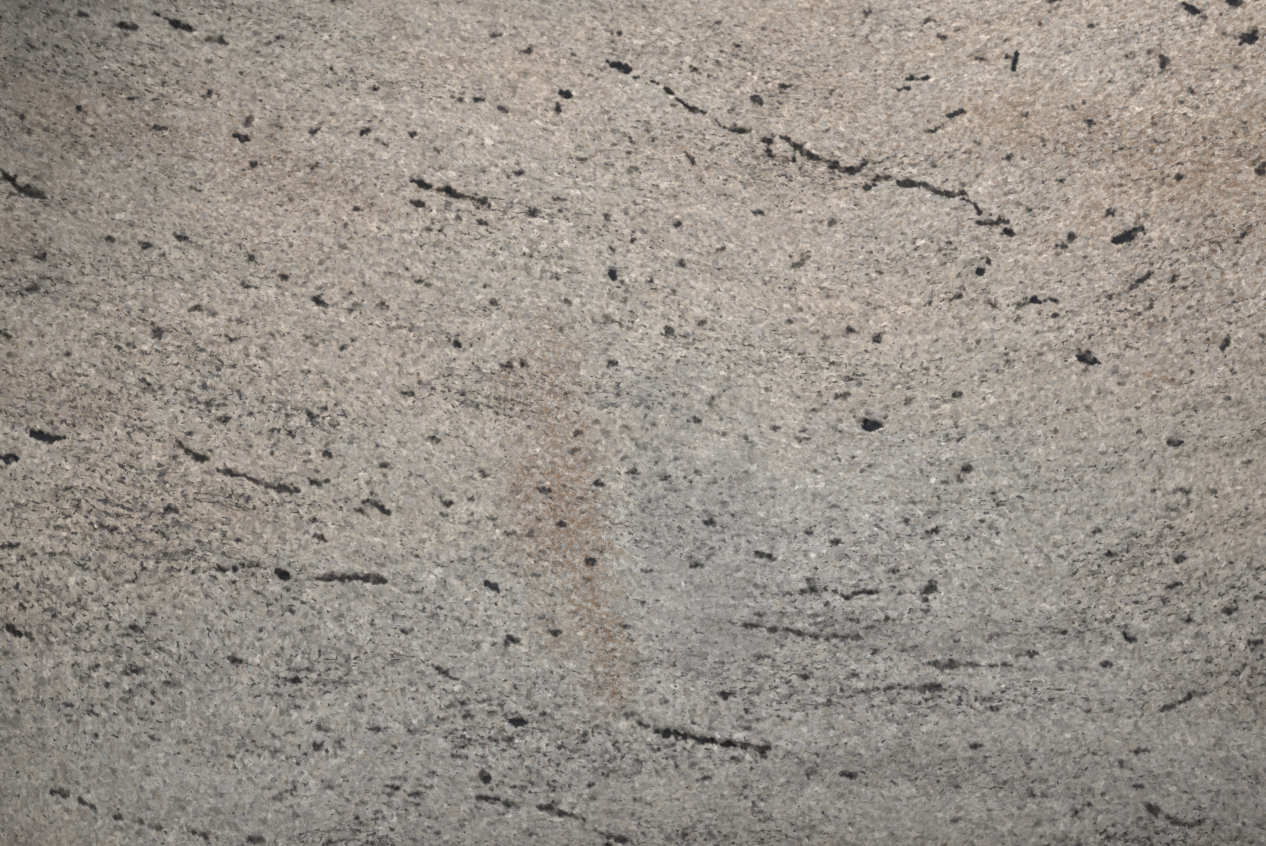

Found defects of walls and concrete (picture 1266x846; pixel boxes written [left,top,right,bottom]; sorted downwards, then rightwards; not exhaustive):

crack [633,75,1016,237]